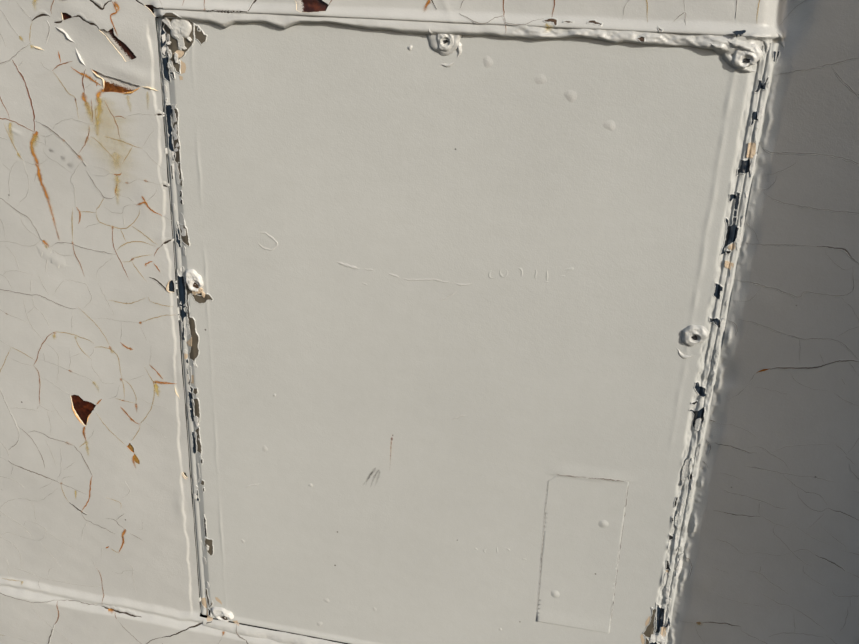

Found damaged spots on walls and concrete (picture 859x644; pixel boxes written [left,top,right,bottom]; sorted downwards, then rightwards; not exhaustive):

peeling [294,0,329,13]
crack [622,0,648,22]
crack [735,0,761,21]
peeling [736,106,764,177]
peeling [41,0,214,502]
peeling [712,191,749,306]
crack [743,224,859,271]
crack [0,1,249,644]
peeling [688,350,719,432]
crack [749,359,859,382]
crack [703,419,716,469]
peeling [640,444,701,644]